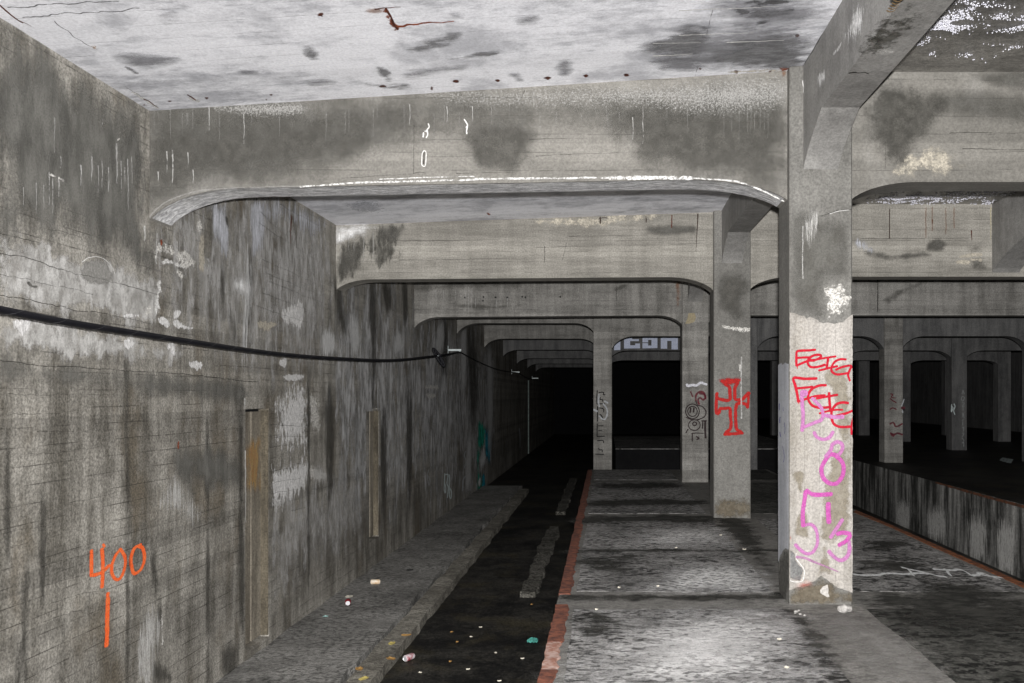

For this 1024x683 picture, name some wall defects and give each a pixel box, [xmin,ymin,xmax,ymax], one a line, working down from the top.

damp [649,0,814,73]
damp [0,38,415,279]
damp [429,101,532,167]
damp [579,94,778,172]
damp [872,92,949,175]
damp [145,280,162,323]
damp [796,213,851,318]
damp [222,199,497,516]
damp [176,426,246,620]
damp [16,597,27,683]